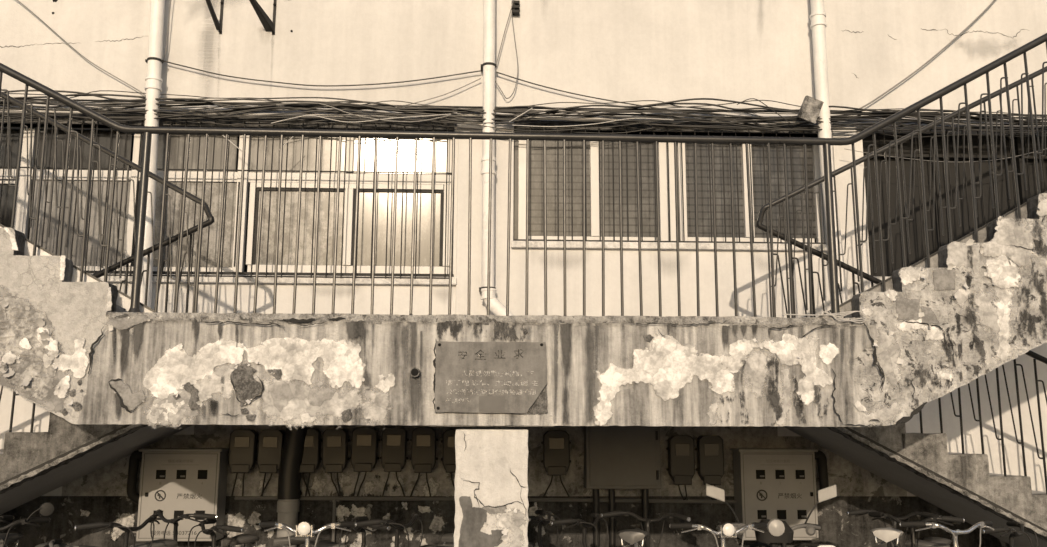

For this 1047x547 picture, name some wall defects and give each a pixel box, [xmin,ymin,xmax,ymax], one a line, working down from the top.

crack [922,29,1027,38]
peeling [0,285,90,416]
peeling [109,337,395,424]
leakage [255,321,391,430]
leakage [437,320,528,341]
leakage [554,323,572,423]
leakage [586,324,598,421]
peeling [593,333,839,426]
peeling [885,216,1033,363]
leakage [1016,268,1047,345]
crack [462,470,527,519]
spalling [459,496,555,547]